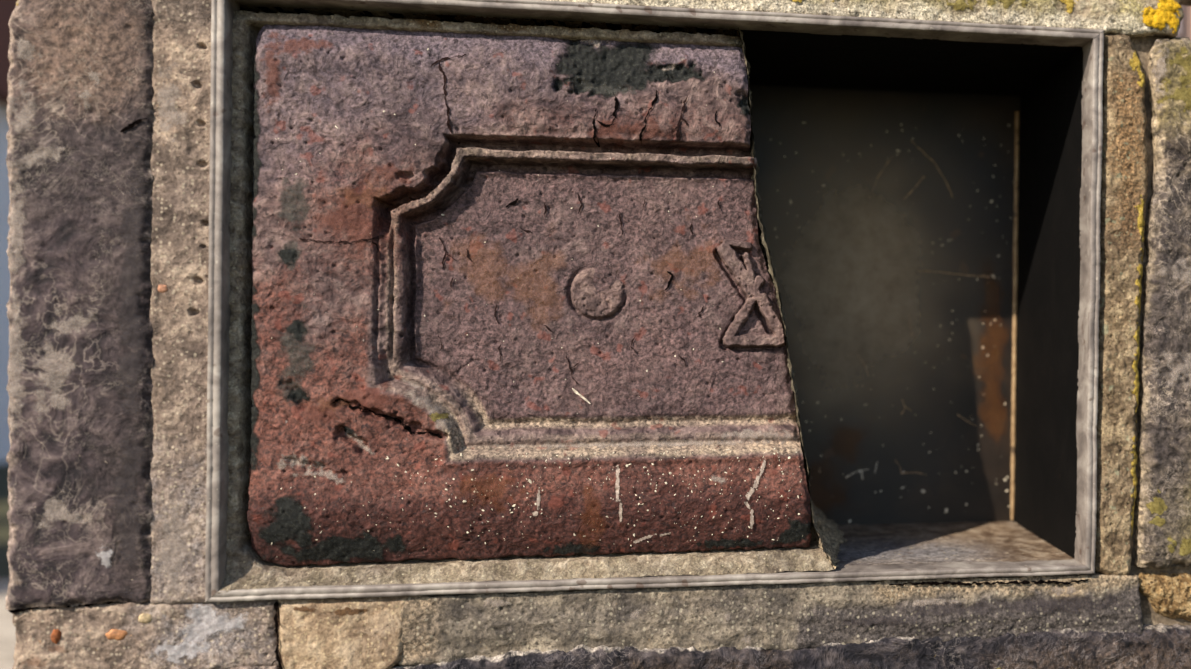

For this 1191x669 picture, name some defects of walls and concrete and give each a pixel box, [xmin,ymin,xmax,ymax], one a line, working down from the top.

crack [430,54,467,144]
crack [592,93,619,147]
crack [639,90,720,142]
crack [330,398,442,438]
damp [259,495,405,563]